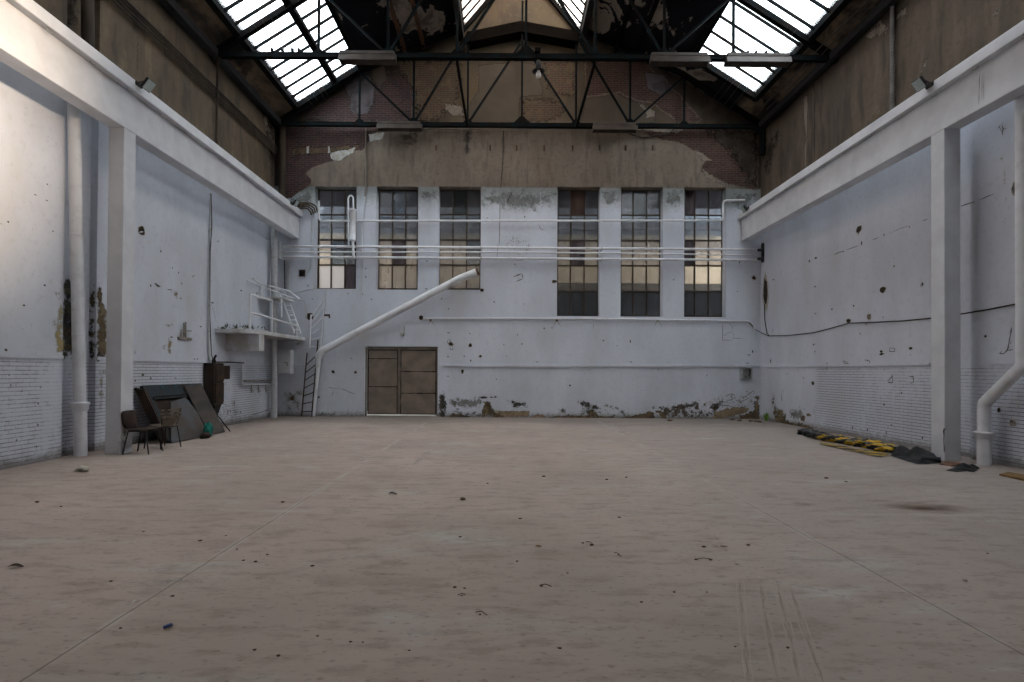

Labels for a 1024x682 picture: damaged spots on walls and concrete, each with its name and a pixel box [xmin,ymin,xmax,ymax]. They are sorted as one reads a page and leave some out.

flaking render [285,60,463,199]
flaking render [523,61,759,190]
spalling [493,391,760,419]
spalling [783,413,814,429]